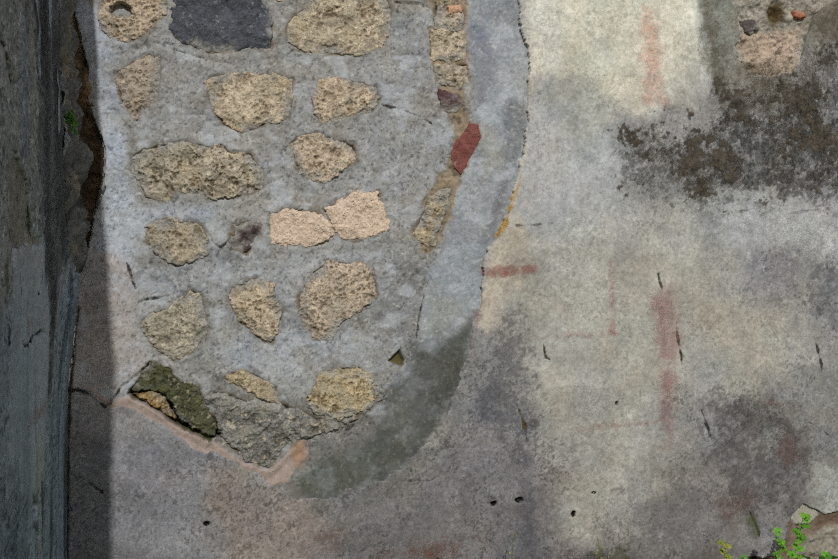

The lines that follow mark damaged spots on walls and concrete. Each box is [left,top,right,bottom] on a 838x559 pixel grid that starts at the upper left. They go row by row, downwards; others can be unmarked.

crack [8,325,41,347]
damp [36,0,70,336]
crack [64,11,104,247]
flaking render [60,0,529,500]
flaking render [731,0,838,76]
flaking render [763,504,838,559]